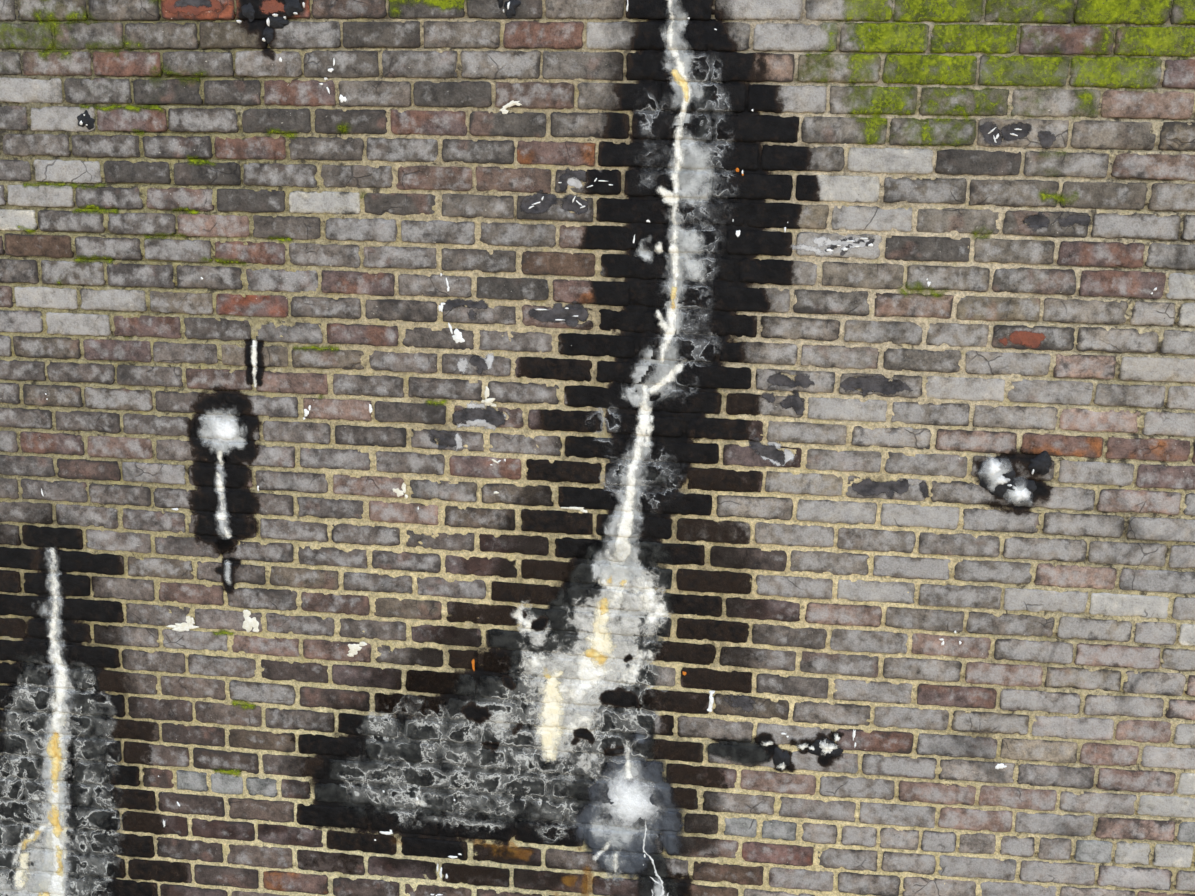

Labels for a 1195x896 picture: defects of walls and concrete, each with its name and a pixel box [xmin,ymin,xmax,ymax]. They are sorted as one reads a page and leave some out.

damp [0,512,188,896]
damp [214,558,241,594]
damp [290,0,820,896]